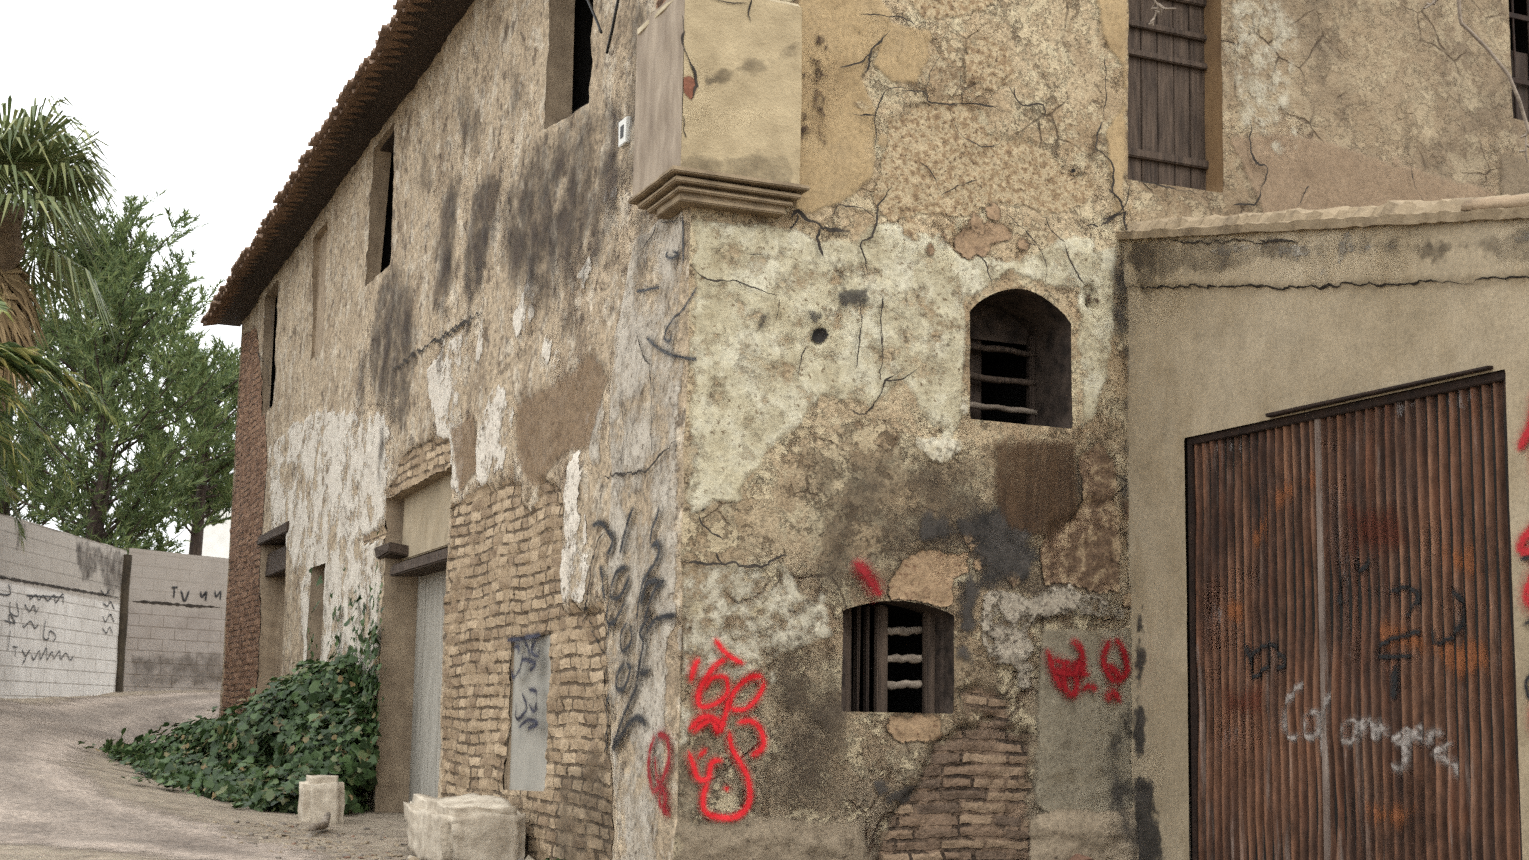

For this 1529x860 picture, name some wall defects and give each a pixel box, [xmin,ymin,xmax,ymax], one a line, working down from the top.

damp [359,270,416,422]
damp [435,109,635,333]
peeling [221,0,1133,860]
crack [790,188,921,415]
crack [839,13,1046,195]
crack [1004,58,1198,283]
crack [1165,121,1310,245]
crack [1135,276,1529,291]
damp [821,440,1083,661]
rust [1380,623,1486,677]
rust [1442,547,1474,574]
rust [1367,805,1404,826]